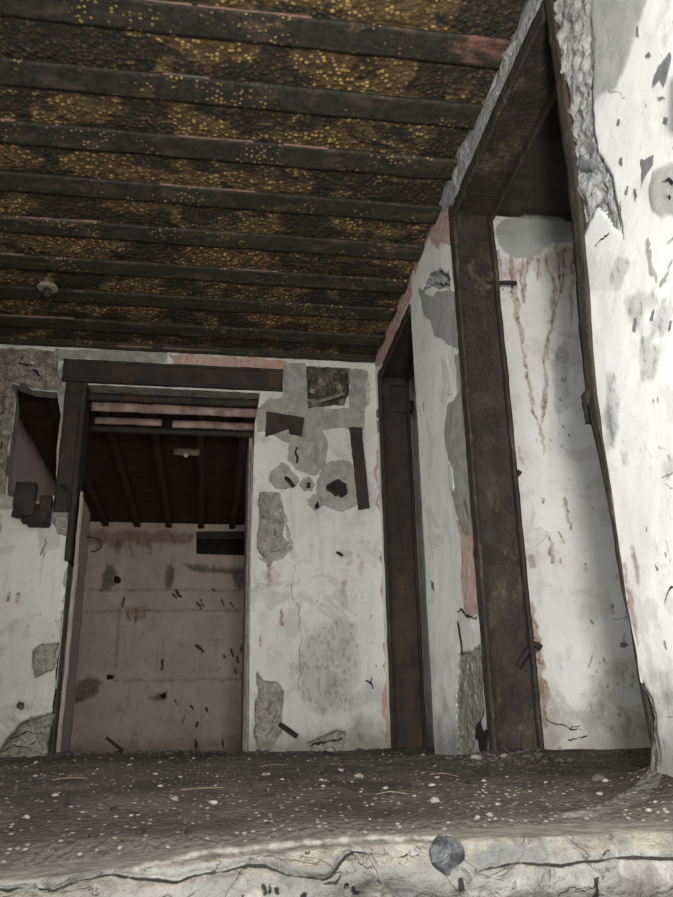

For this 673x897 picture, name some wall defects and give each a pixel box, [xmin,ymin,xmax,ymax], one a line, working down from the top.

spalling [424,0,542,247]
spalling [554,0,654,231]
spalling [0,348,62,494]
flaking render [169,354,367,565]
flaking render [376,261,488,754]
spalling [32,568,67,678]
spalling [0,702,54,758]
spalling [253,672,299,751]
flaking render [308,730,346,752]
crack [0,851,419,892]
crack [479,850,673,872]